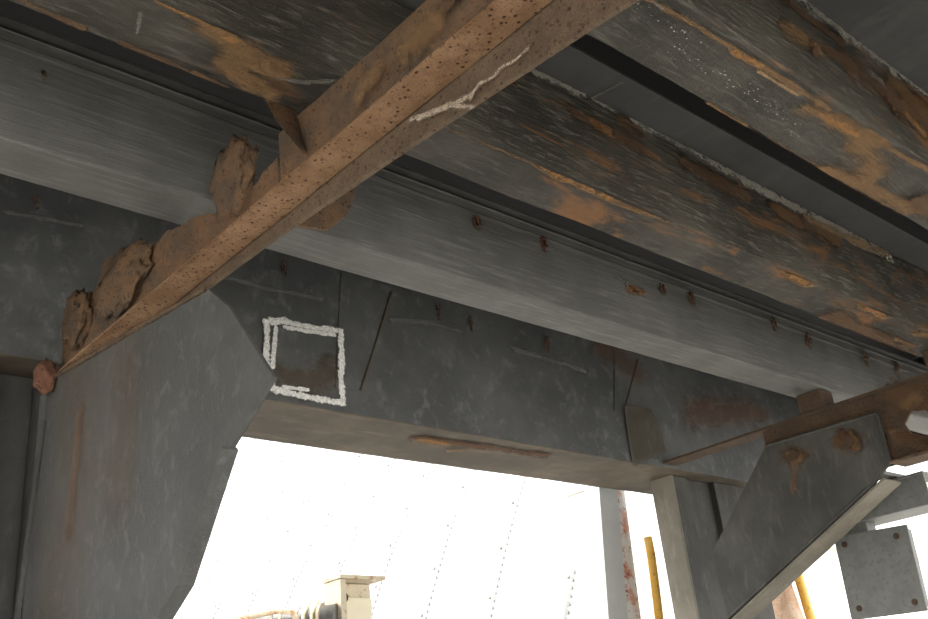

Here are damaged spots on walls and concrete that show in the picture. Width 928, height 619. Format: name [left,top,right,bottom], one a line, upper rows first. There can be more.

peeling [798,0,928,96]
peeling [529,68,894,264]
rust [818,300,928,358]
rust [410,436,550,458]